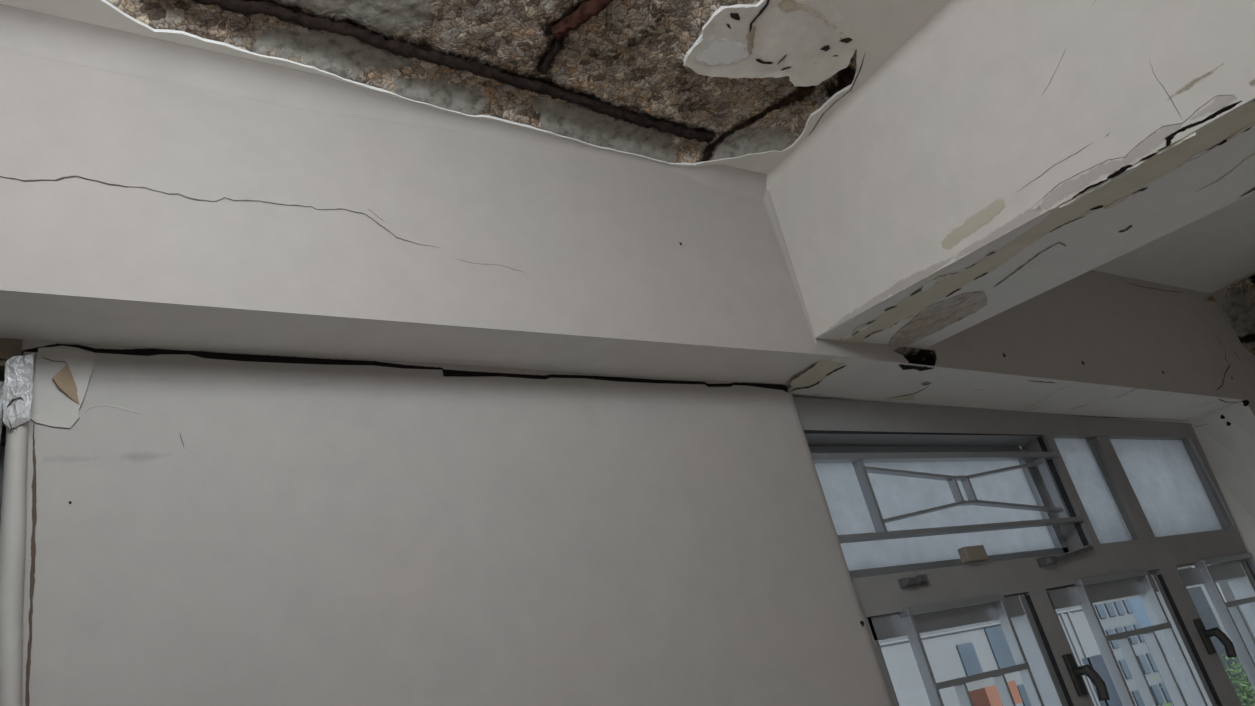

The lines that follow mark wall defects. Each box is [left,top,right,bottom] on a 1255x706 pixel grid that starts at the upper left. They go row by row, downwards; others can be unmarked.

spalling [101,0,857,165]
crack [0,176,522,272]
peeling [817,95,1255,401]
crack [0,341,789,393]
peeling [790,361,847,392]